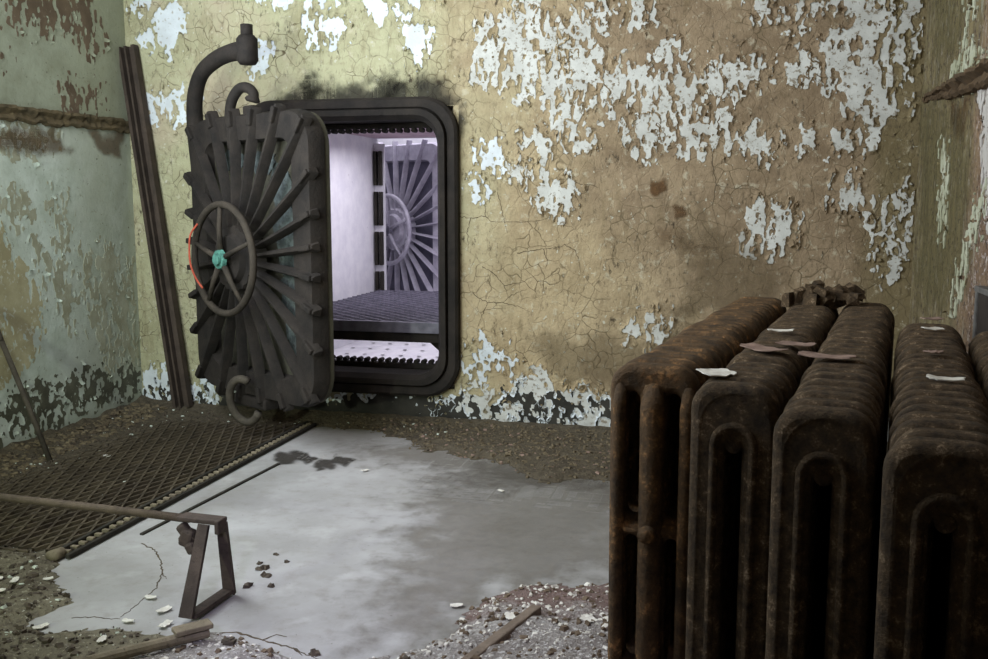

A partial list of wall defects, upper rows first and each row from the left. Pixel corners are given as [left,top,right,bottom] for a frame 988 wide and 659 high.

peeling [0,0,111,117]
peeling [126,0,191,62]
peeling [244,0,445,82]
peeling [949,0,988,79]
peeling [0,120,65,168]
peeling [461,0,926,292]
peeling [920,88,988,330]
peeling [0,180,172,449]
spalling [294,325,611,427]
peeling [619,298,677,355]